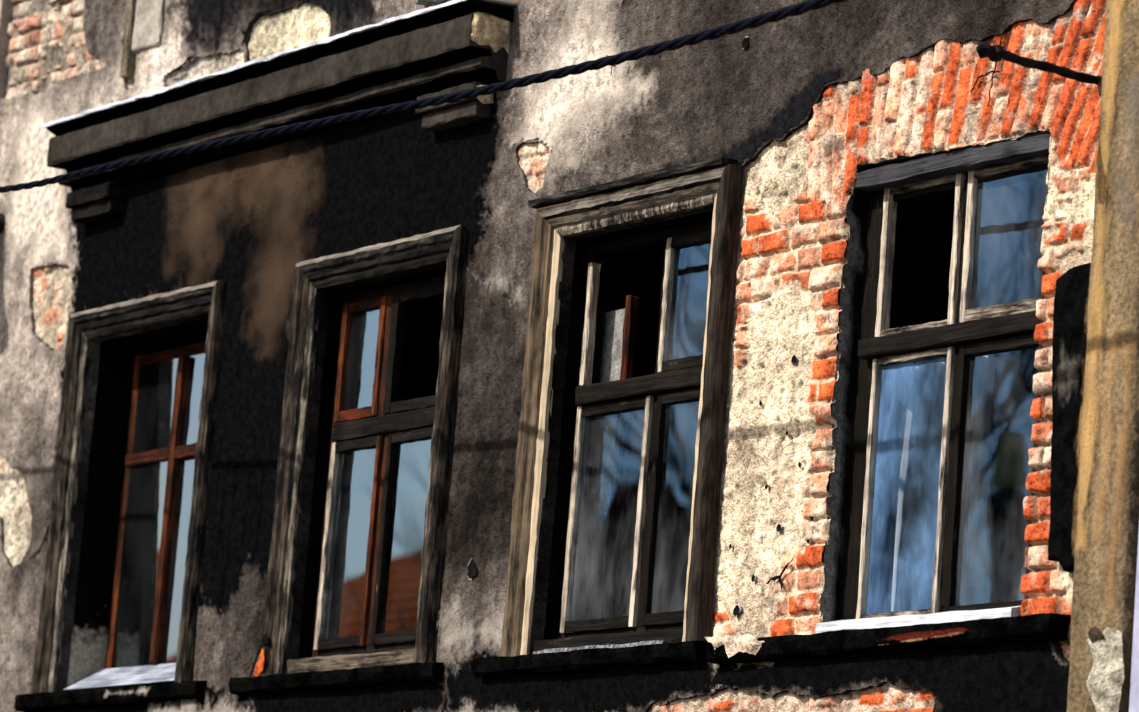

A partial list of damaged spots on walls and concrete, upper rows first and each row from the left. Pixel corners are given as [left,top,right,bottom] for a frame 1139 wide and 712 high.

spalling [4,0,106,99]
spalling [167,3,330,87]
damp [510,0,654,169]
spalling [519,142,549,193]
spalling [33,264,71,350]
spalling [705,0,1106,669]
spalling [0,452,32,566]
crack [766,558,793,590]
spalling [649,682,935,712]